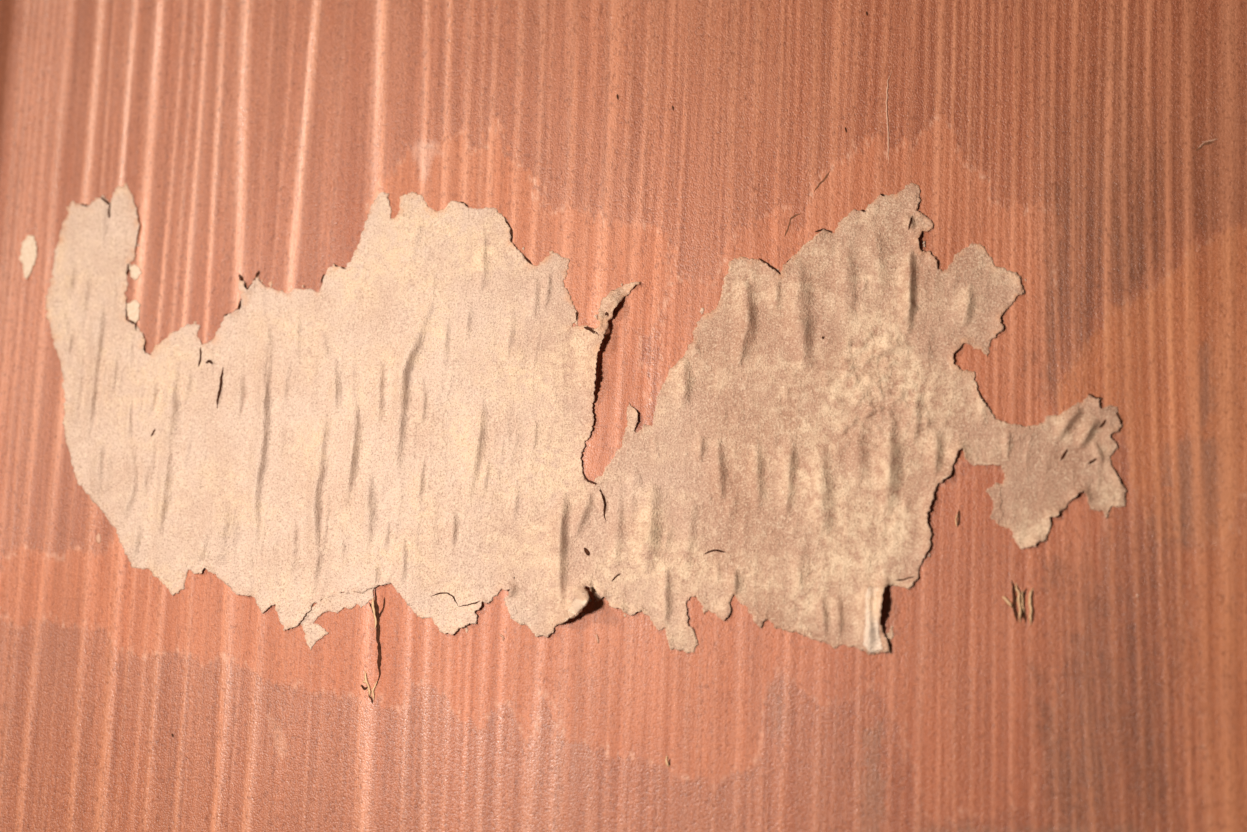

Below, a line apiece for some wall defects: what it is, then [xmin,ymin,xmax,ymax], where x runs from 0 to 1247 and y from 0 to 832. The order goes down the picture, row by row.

peeling [19,235,37,280]
peeling [129,264,142,280]
peeling [126,299,140,323]